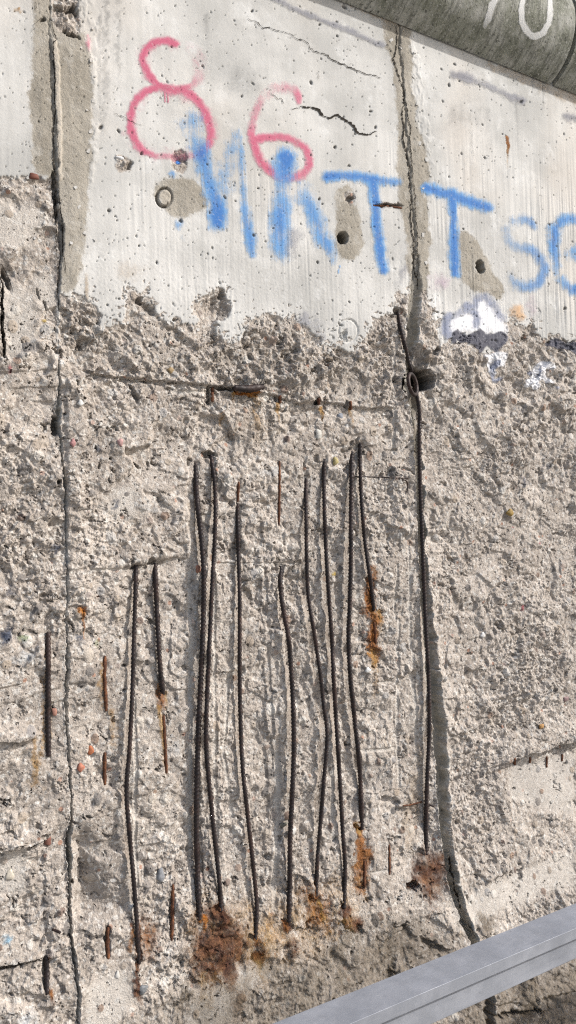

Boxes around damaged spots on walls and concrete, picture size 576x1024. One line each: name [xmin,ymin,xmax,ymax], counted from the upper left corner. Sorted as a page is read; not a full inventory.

crack [35,2,66,311]
crack [248,18,419,290]
spalling [343,191,356,205]
spalling [0,175,77,1024]
spalling [58,287,576,1024]
rust [364,566,383,664]
rust [193,904,299,989]
rust [308,894,363,928]
rust [351,822,373,893]
rust [406,854,446,900]
crack [448,855,475,938]